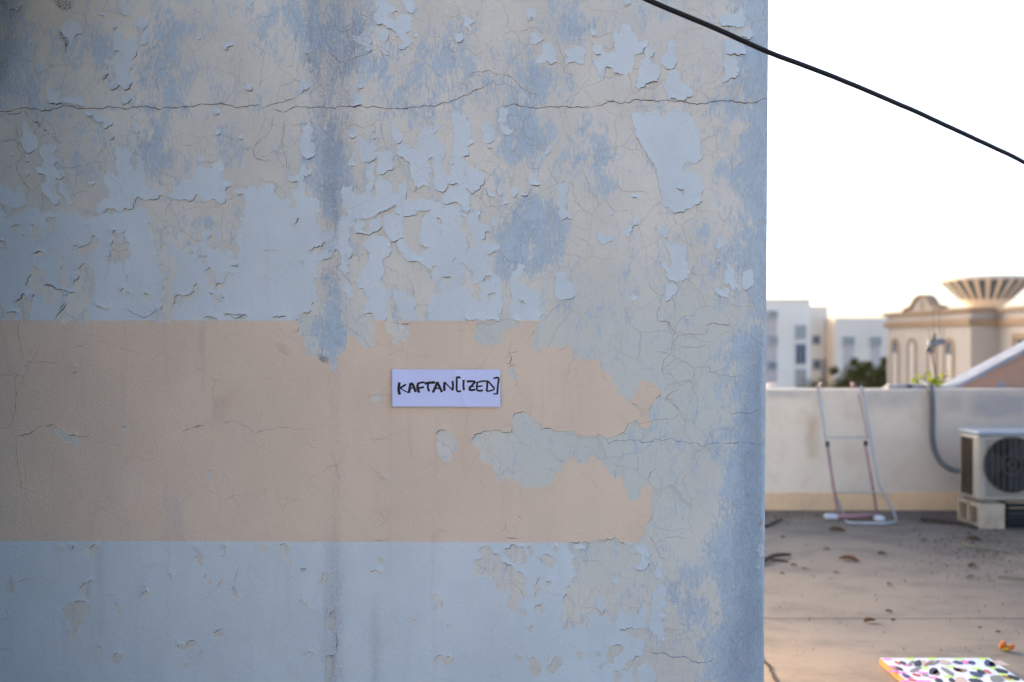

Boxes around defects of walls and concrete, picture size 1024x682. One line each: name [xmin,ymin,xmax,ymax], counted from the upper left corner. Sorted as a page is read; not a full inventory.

peeling [20,120,71,232]
peeling [45,85,241,215]
peeling [272,256,376,372]
crack [0,3,766,196]
peeling [353,0,418,56]
peeling [347,108,541,303]
peeling [526,8,704,214]
peeling [660,225,690,302]
peeling [719,2,753,83]
crack [606,304,764,481]
peeling [472,544,558,633]
crack [649,630,714,675]